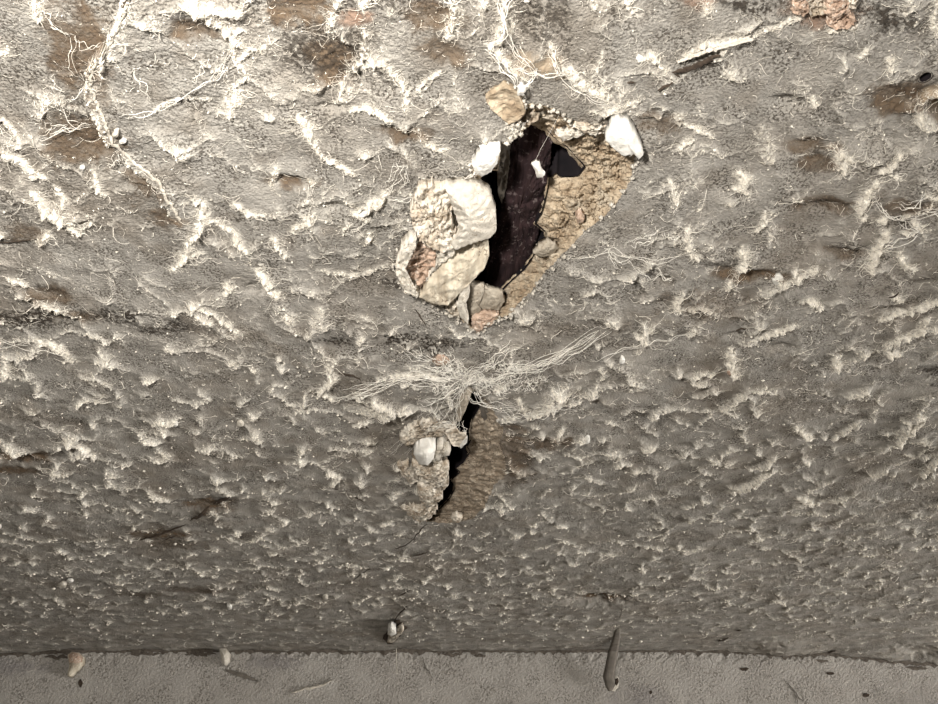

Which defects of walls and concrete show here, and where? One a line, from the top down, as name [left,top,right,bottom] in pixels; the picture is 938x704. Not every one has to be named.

spalling [391,78,643,336]
spalling [397,386,507,524]